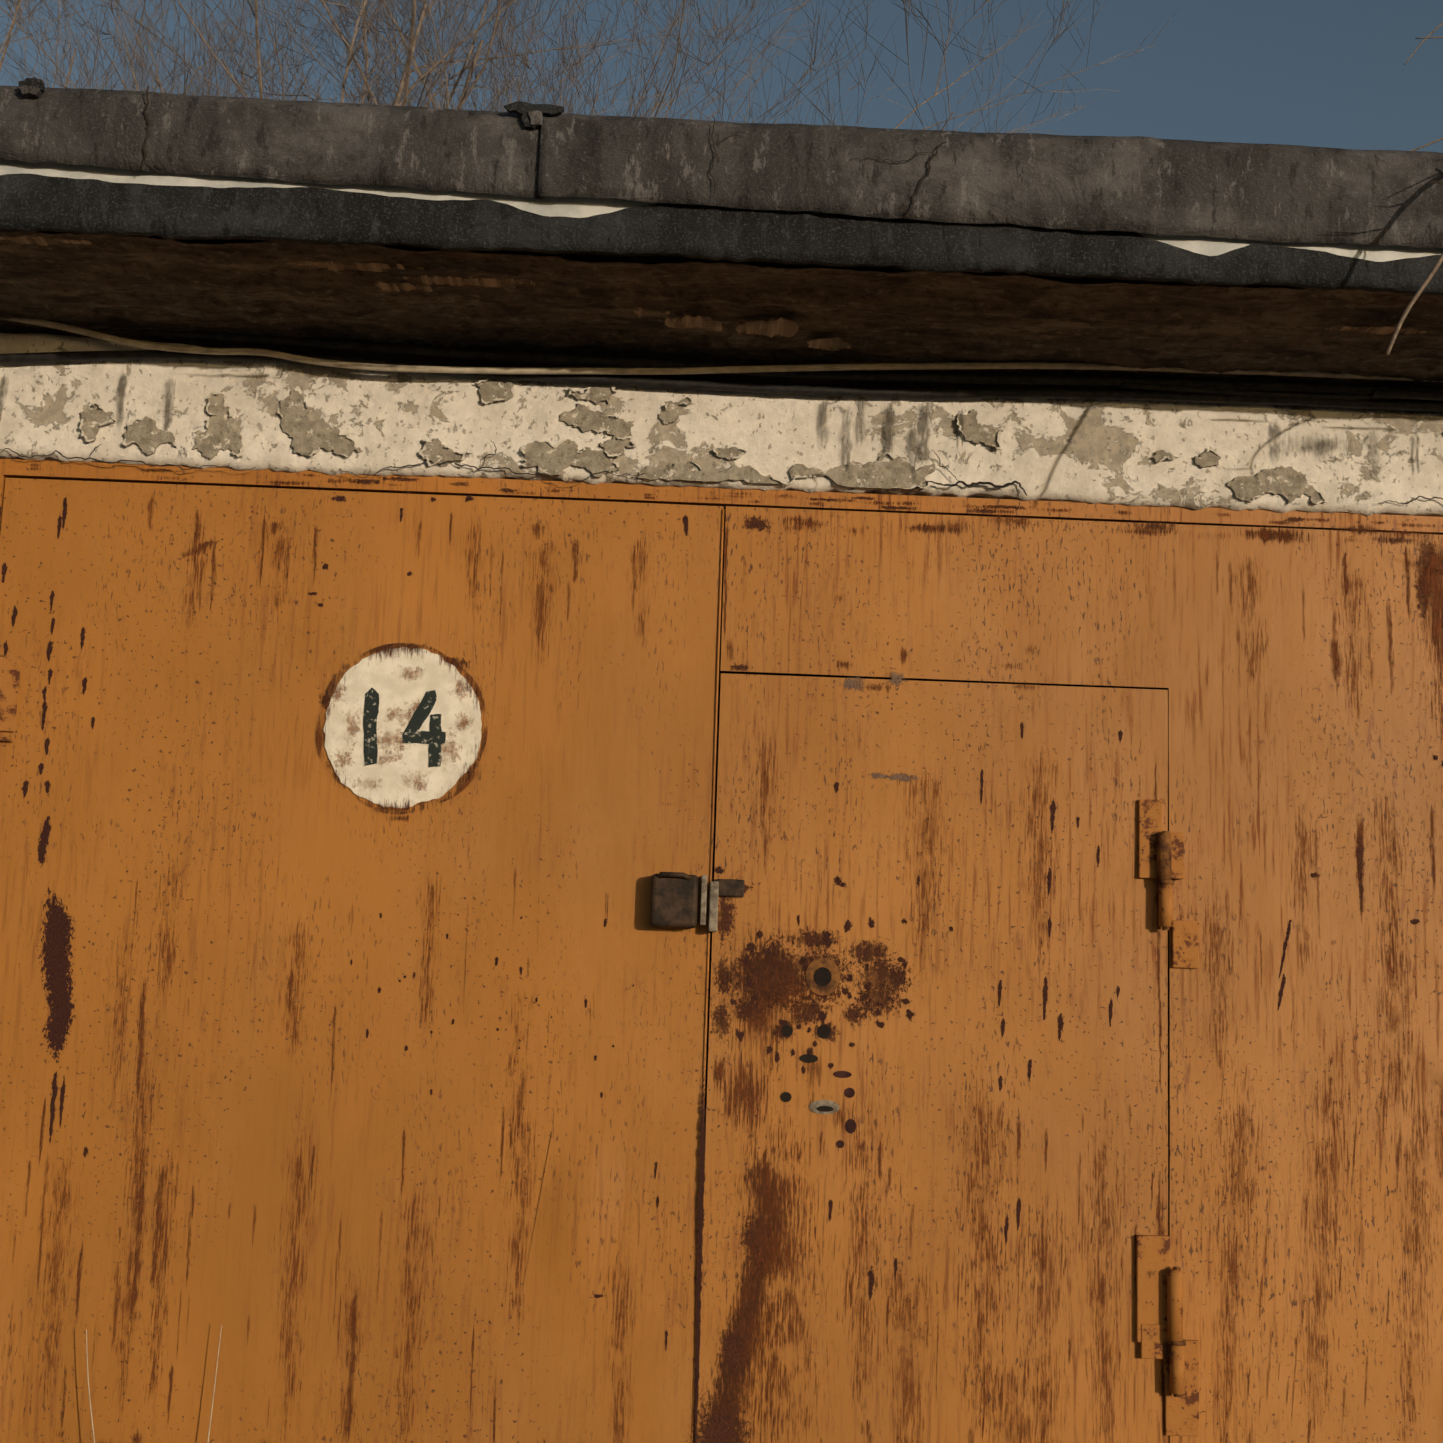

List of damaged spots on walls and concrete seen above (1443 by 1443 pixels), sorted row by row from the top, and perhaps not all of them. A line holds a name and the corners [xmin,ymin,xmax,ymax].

peeling [79,390,244,460]
peeling [277,389,363,458]
peeling [475,379,514,404]
peeling [520,384,637,478]
peeling [638,447,936,490]
peeling [1227,466,1327,505]
corrosion [22,590,55,798]
corrosion [1246,517,1443,728]
corrosion [25,887,88,1436]
corrosion [684,772,956,1443]
corrosion [945,1067,1137,1443]
corrosion [1354,799,1443,1437]